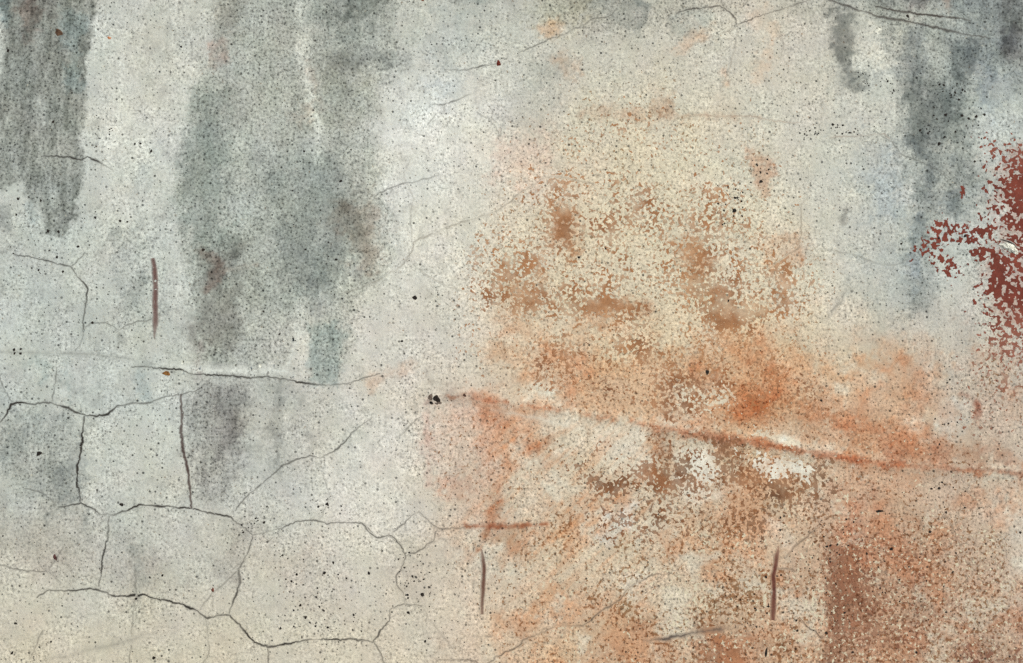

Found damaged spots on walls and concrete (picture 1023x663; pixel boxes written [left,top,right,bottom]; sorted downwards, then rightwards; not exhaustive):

crack [41,154,113,170]
crack [0,252,673,663]
leakage [0,0,754,643]
crack [338,159,605,298]
corrosion [361,0,1023,663]
leakage [771,0,1023,359]